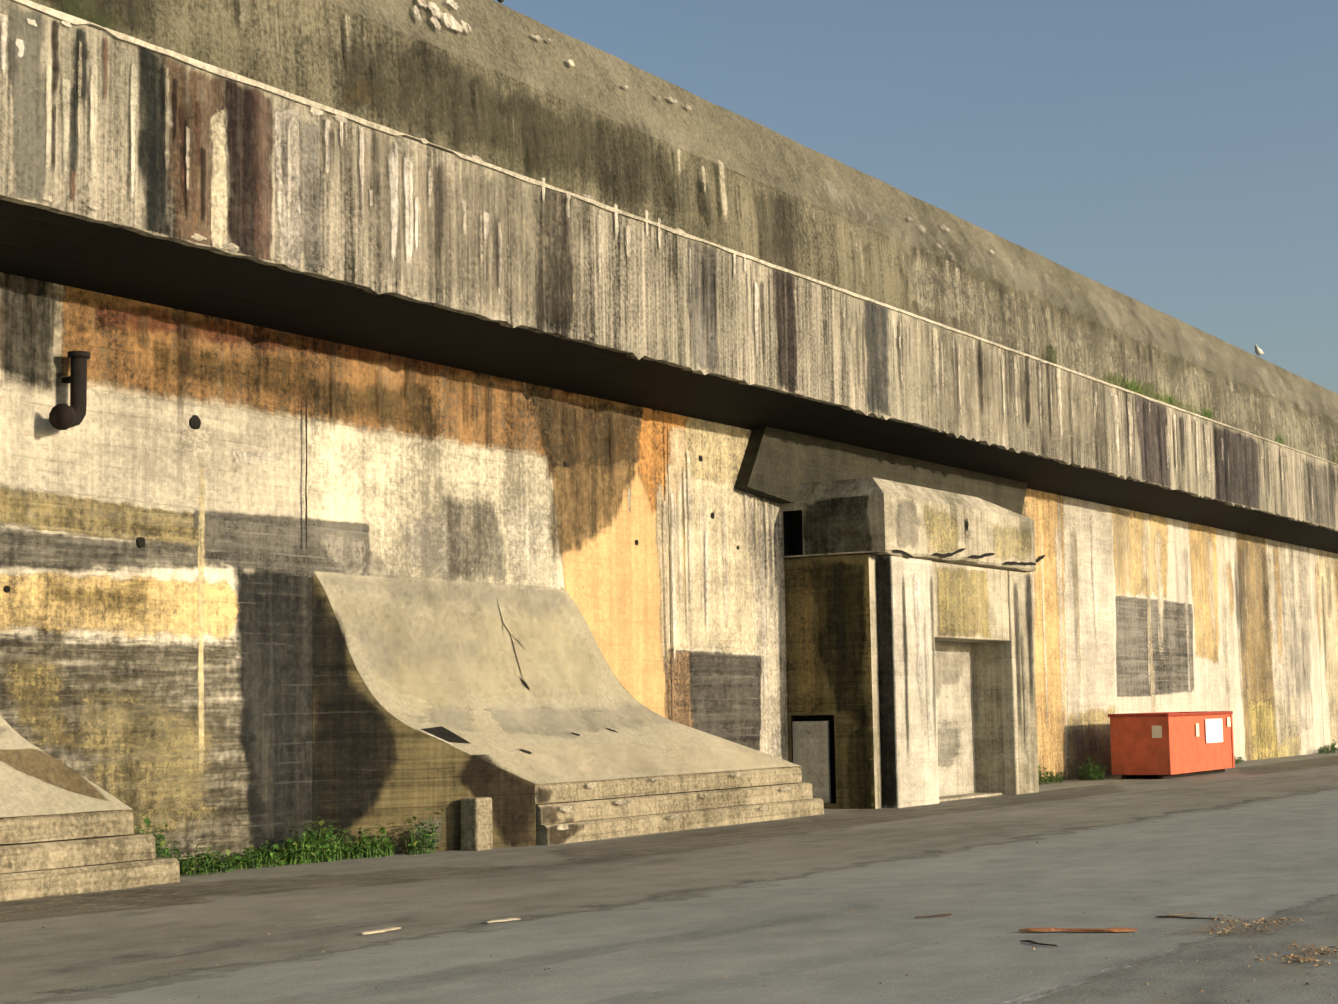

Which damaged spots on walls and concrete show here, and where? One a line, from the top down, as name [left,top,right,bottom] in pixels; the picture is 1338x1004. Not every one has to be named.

damp [1,0,150,203]
damp [131,46,228,250]
corrosion [164,56,273,261]
spalling [414,0,471,33]
damp [0,272,60,390]
damp [825,225,1338,528]
corrosion [62,285,693,728]
crack [496,598,525,683]
damp [406,382,642,589]
damp [656,417,787,761]
damp [803,495,959,808]
damp [1015,496,1338,778]